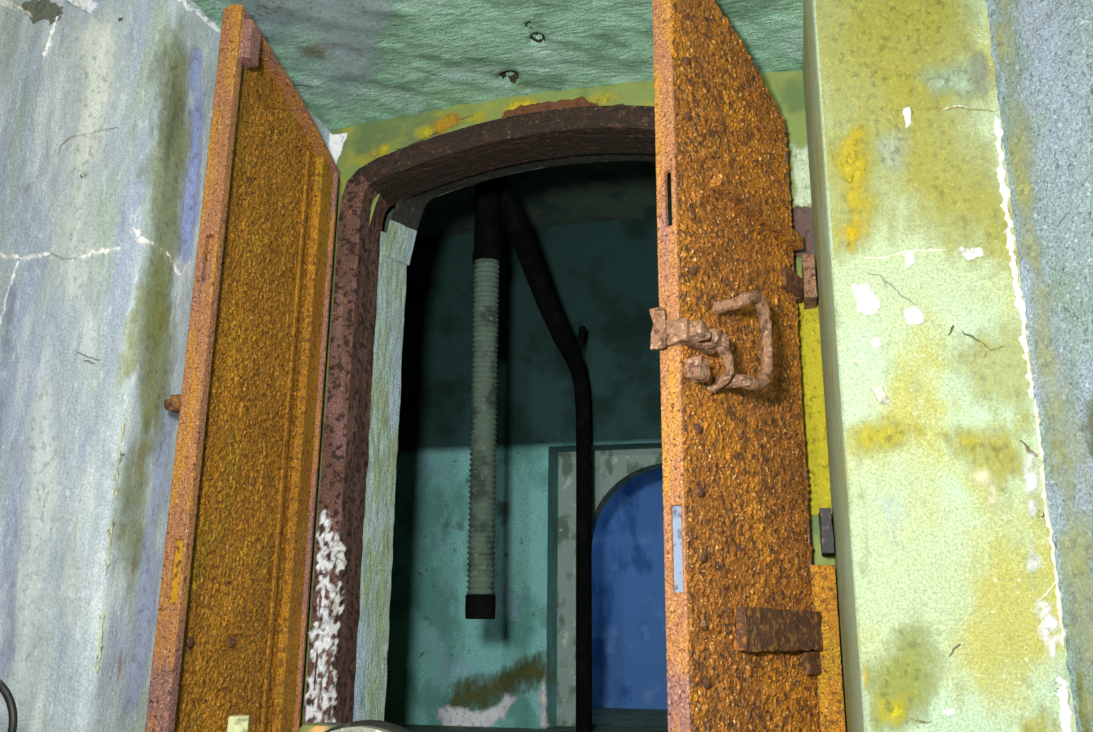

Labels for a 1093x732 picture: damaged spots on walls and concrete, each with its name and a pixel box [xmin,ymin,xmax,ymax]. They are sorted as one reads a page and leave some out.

spalling [0,0,99,25]
rust [502,96,599,118]
peeling [861,247,983,267]
crack [0,227,181,324]
peeling [852,283,880,315]
peeling [904,307,924,324]
peeling [994,116,1066,657]
peeling [1053,676,1075,732]